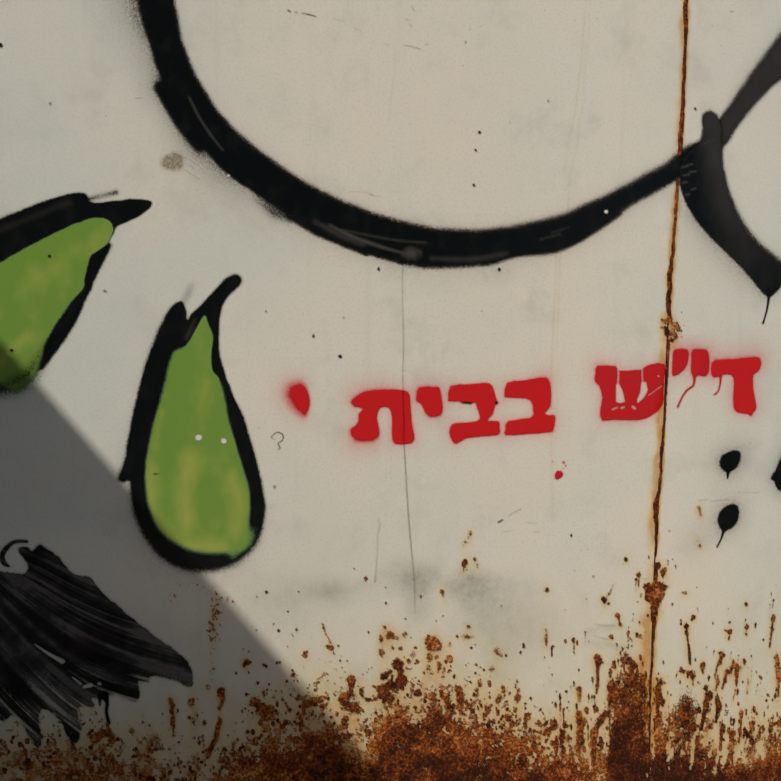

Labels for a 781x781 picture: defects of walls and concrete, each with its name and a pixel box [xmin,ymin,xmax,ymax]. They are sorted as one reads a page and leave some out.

rust [677,0,688,156]
rust [0,178,781,781]